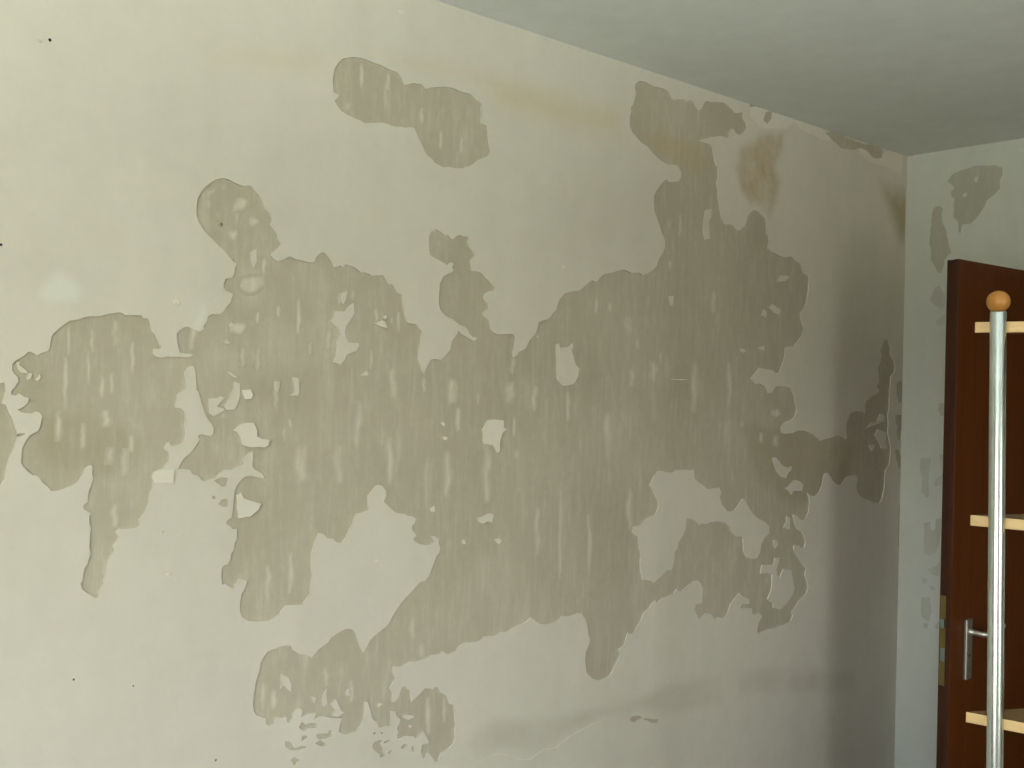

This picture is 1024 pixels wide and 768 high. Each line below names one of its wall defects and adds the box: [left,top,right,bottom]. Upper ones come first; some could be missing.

peeling [333,57,490,168]
leakage [731,126,787,225]
peeling [929,165,1002,273]
peeling [0,81,902,765]